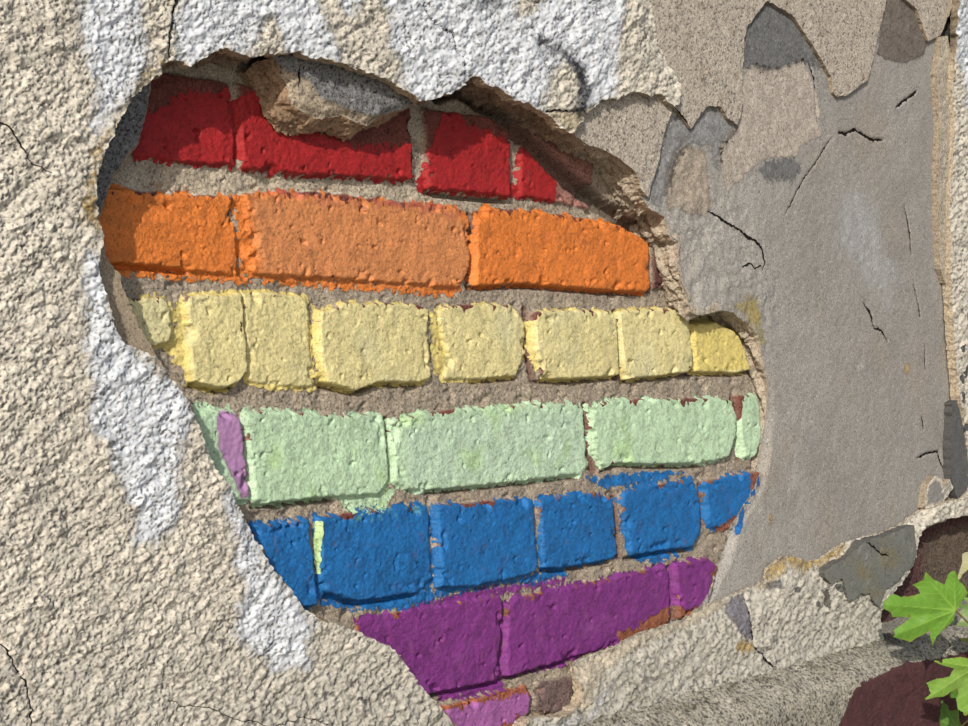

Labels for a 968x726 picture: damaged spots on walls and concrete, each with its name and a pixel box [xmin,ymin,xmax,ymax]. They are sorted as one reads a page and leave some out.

crack [168,0,179,58]
crack [0,122,52,173]
flaking render [95,81,151,221]
flaking render [195,51,428,142]
crack [787,63,883,210]
crack [708,211,765,271]
flaking render [99,240,197,421]
flaking render [443,0,953,669]
crack [0,644,33,724]